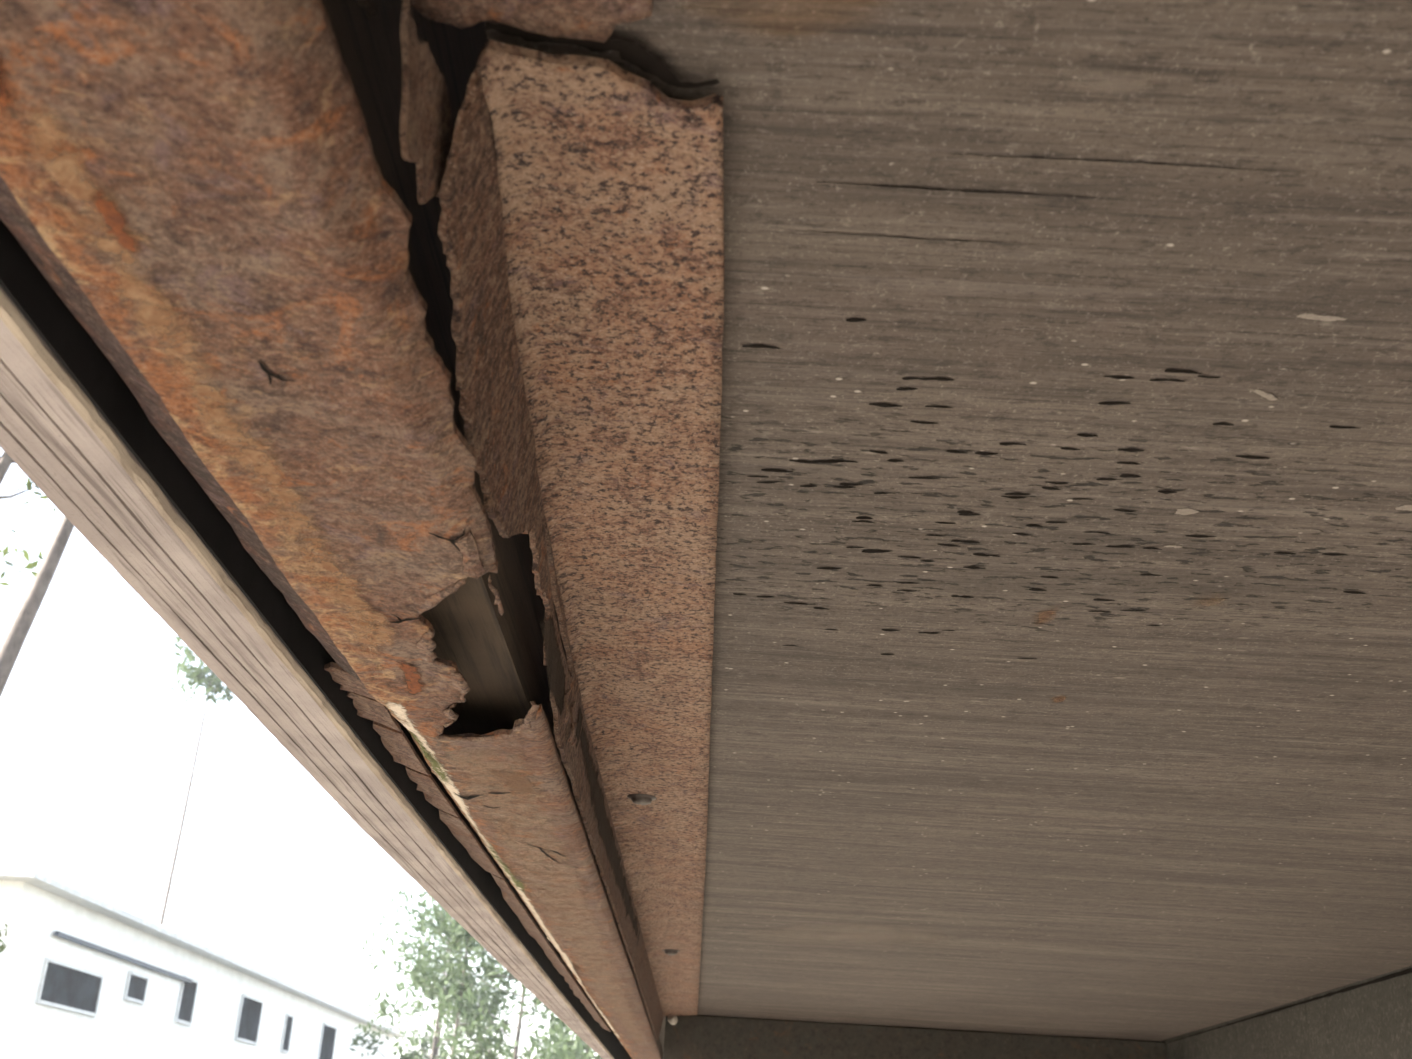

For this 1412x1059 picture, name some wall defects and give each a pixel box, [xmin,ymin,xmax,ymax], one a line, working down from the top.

rust [399,0,453,204]
crack [485,22,720,88]
rust [27,112,623,1045]
rust [563,689,640,948]